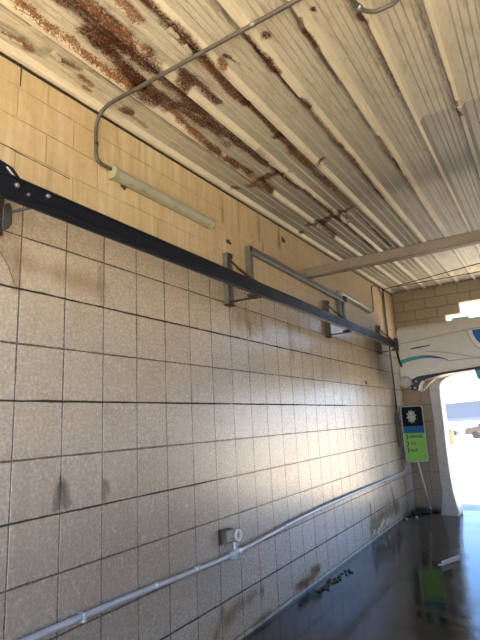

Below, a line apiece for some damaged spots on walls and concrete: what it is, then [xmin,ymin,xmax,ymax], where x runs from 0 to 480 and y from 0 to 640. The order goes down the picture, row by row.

corrosion [11,0,388,254]